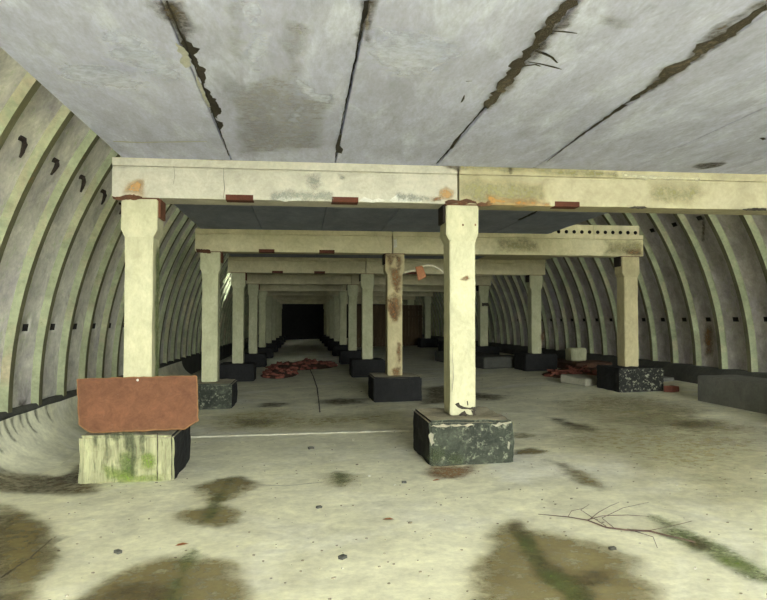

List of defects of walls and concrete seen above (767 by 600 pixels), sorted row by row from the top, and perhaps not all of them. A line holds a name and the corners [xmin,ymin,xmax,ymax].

crack [166,0,229,198]
crack [335,1,369,158]
rust [387,256,401,321]
damp [105,432,144,471]
damp [178,477,255,527]
damp [0,508,55,600]
damp [80,559,246,600]
damp [473,524,654,600]